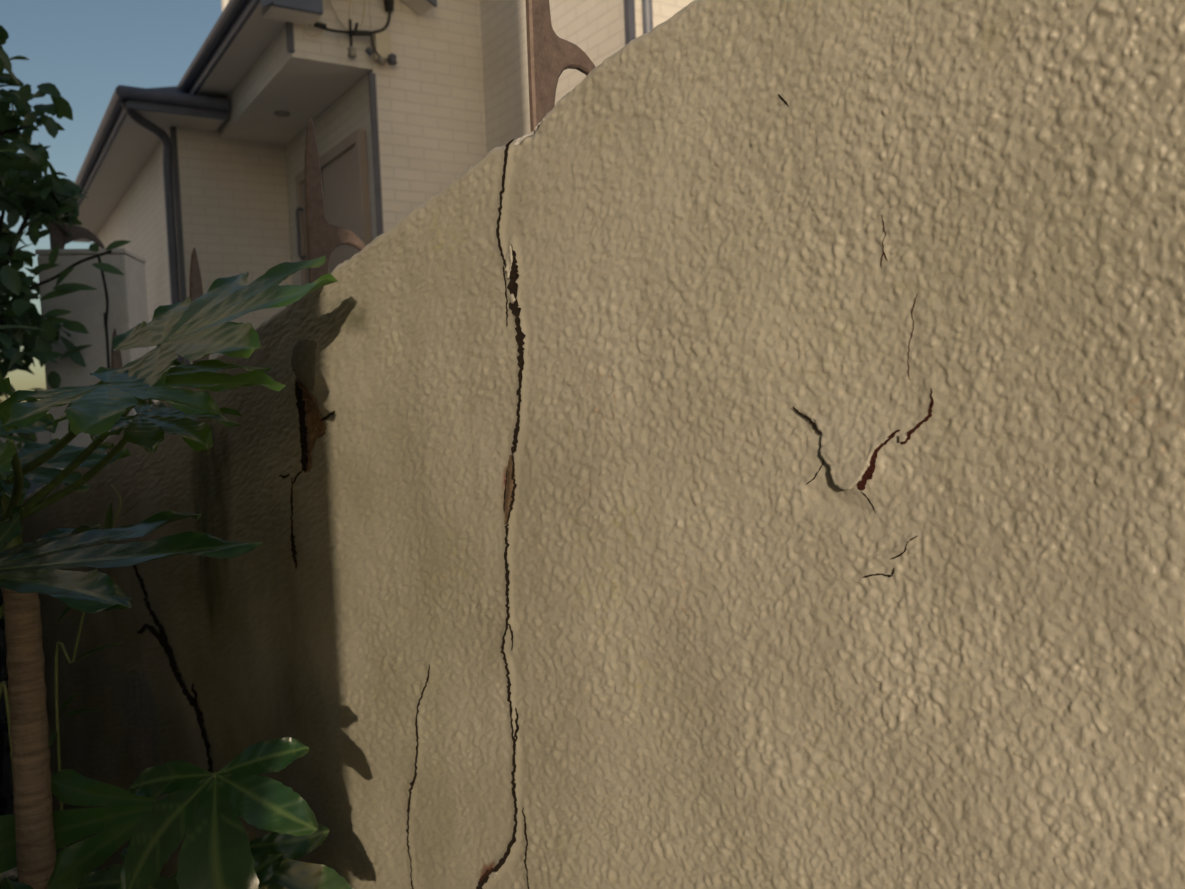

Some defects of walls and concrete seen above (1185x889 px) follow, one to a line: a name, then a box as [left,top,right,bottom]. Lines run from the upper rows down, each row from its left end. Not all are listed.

crack [290,470,303,570]
spalling [278,378,335,479]
crack [476,139,529,889]
flaking render [792,389,934,513]
crack [133,565,212,773]
crack [406,664,430,889]